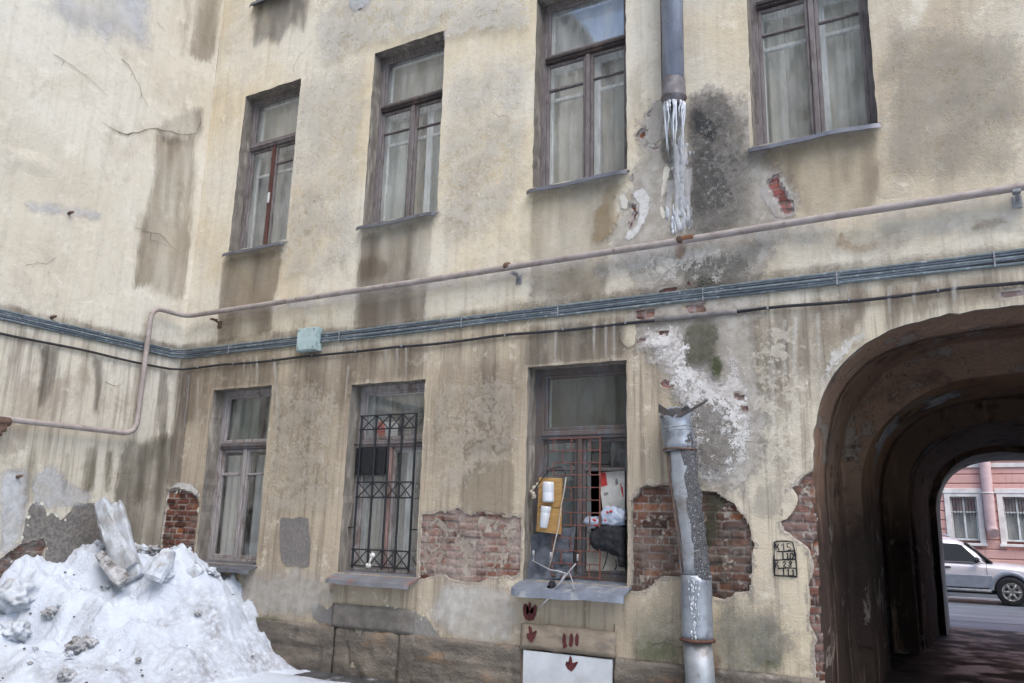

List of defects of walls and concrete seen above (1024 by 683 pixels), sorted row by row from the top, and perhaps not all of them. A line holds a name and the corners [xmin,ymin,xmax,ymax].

crack [106,107,223,138]
water stain [661,93,747,235]
peeling [602,83,826,682]
water stain [108,454,138,501]
peeling [0,501,103,578]
flaking render [160,482,200,553]
flaking render [416,505,524,586]